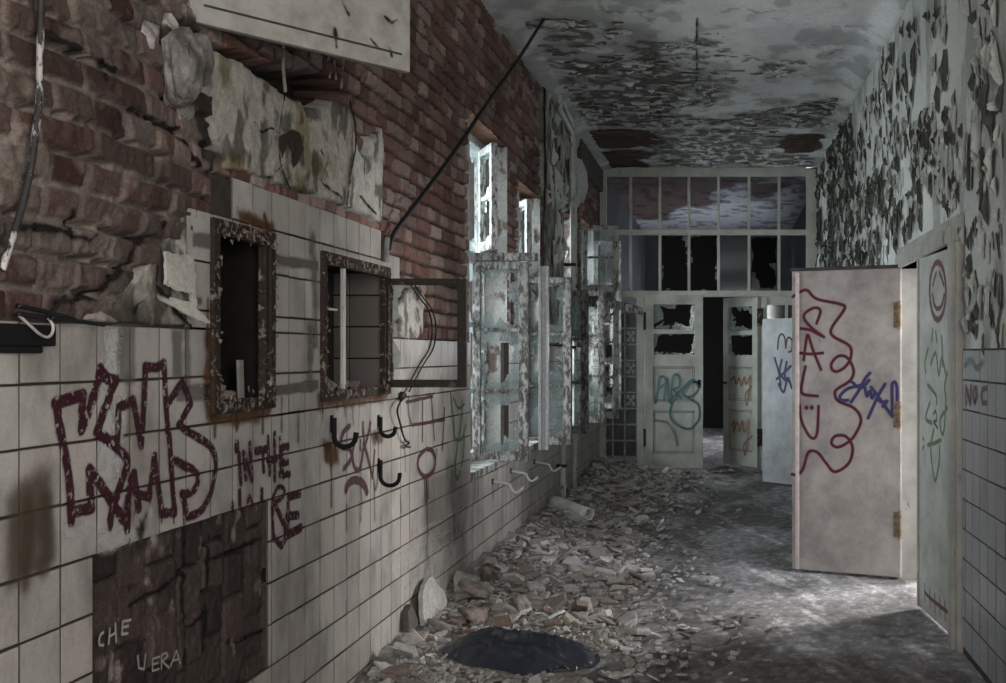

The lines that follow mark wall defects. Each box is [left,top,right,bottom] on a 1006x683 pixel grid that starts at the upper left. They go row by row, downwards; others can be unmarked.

spalling [156,16,201,43]
peeling [83,217,211,326]
rust [204,299,270,438]
rust [238,211,275,233]
peeling [192,51,384,224]
peeling [396,287,426,339]
peeling [525,0,1004,355]
peeling [91,501,264,683]